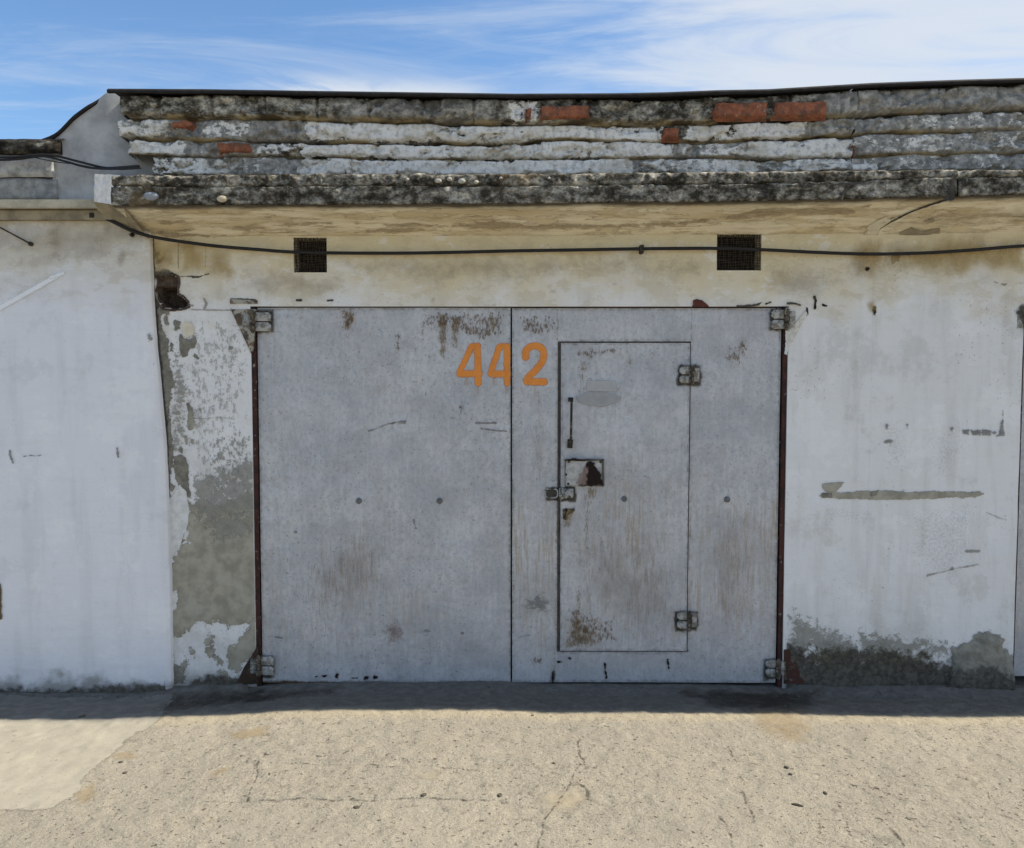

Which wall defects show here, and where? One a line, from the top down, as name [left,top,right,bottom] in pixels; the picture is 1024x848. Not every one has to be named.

rust [422,312,504,358]
flaking render [154,272,255,685]
rust [563,458,603,527]
spalling [820,482,984,500]
rust [551,590,615,683]
damp [786,645,953,689]